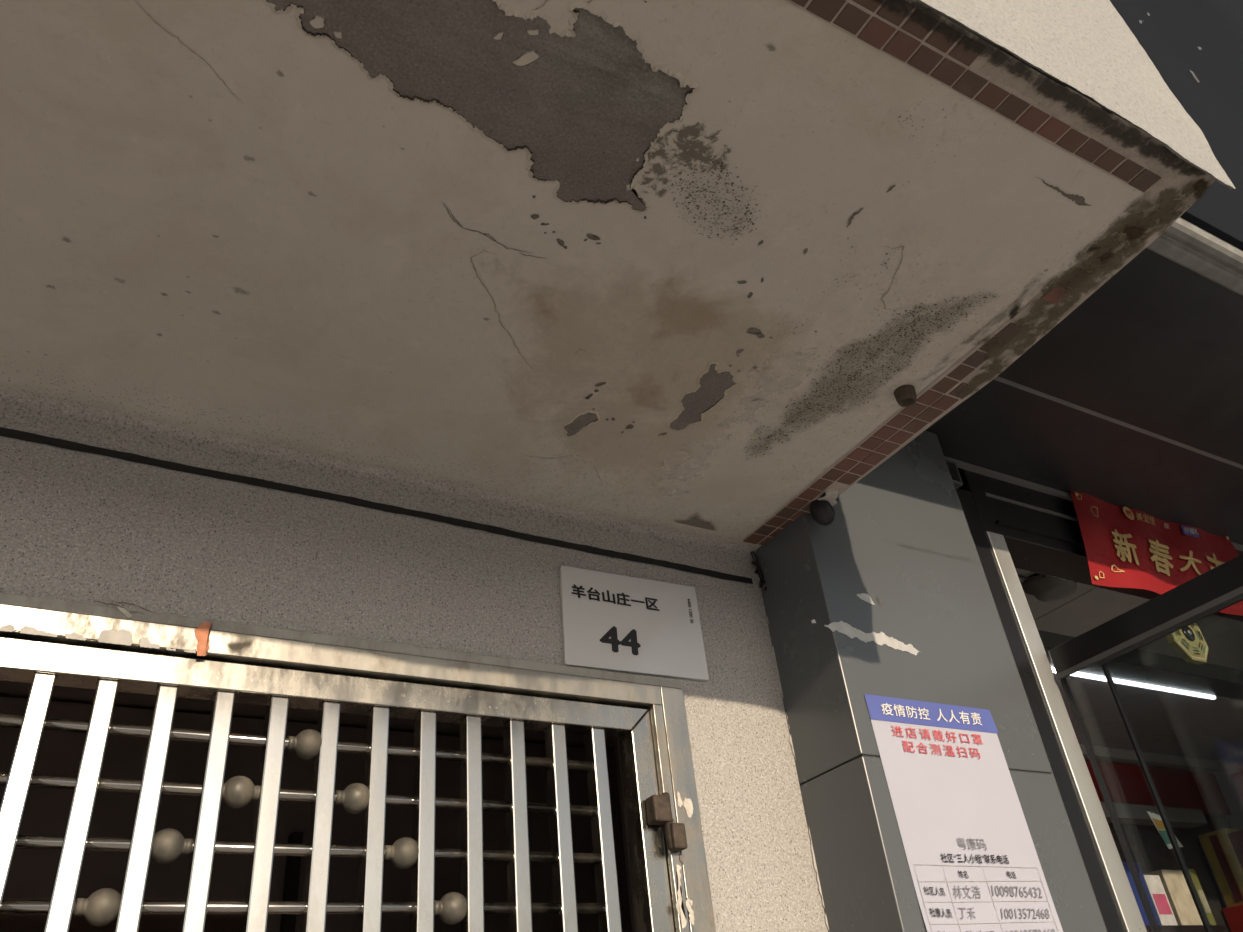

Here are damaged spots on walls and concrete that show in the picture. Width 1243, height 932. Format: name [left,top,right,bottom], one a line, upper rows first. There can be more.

peeling [260,0,763,249]
crack [443,203,547,369]
peeling [561,382,635,438]
peeling [658,349,758,436]
peeling [746,328,772,339]
damp [745,291,997,459]
damp [959,179,1208,399]